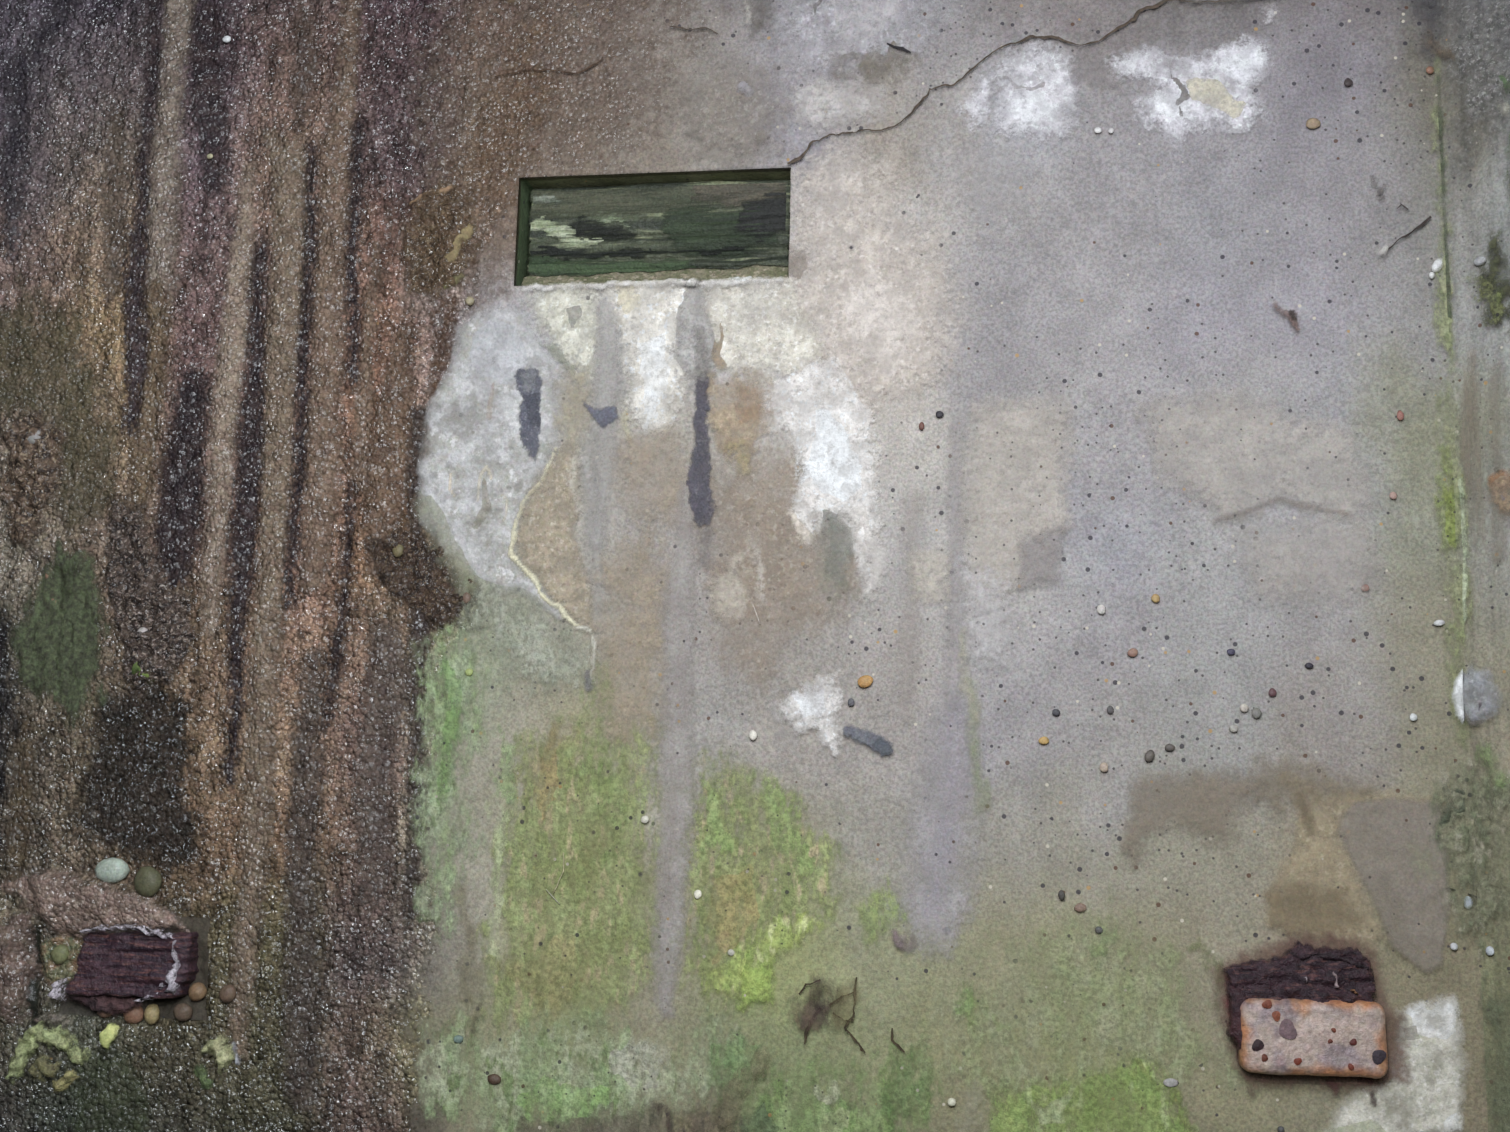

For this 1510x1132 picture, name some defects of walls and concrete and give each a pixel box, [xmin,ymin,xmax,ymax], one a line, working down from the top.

crack [787,0,1233,164]
damp [960,34,1268,144]
flaking render [365,311,607,664]
damp [515,146,950,1014]
damp [902,712,977,946]
rust [1219,933,1407,1106]